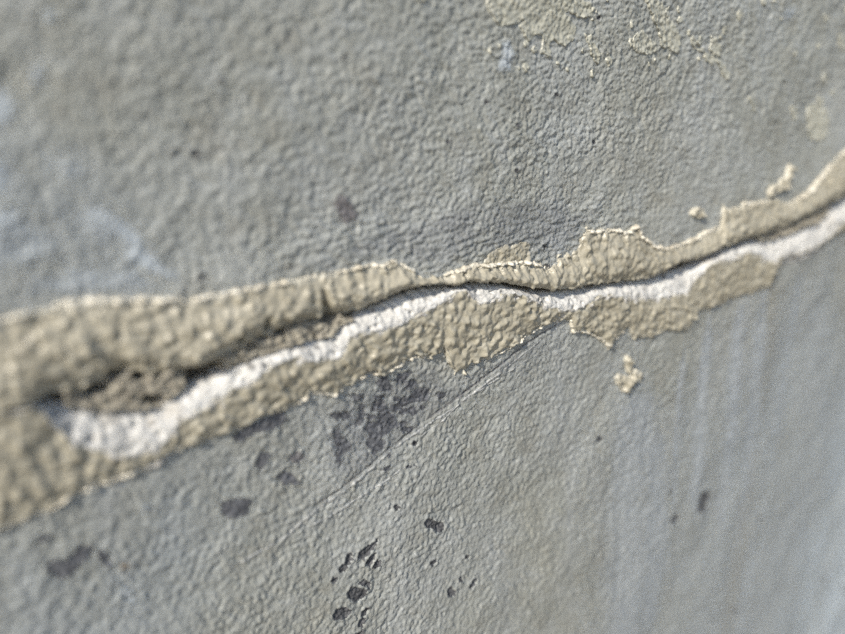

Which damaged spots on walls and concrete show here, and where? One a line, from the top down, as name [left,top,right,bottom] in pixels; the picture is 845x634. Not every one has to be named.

peeling [486,0,613,78]
peeling [628,0,730,80]
peeling [790,72,836,142]
peeling [689,206,708,218]
peeling [767,164,798,197]
crack [4,196,845,472]
peeling [614,355,644,393]